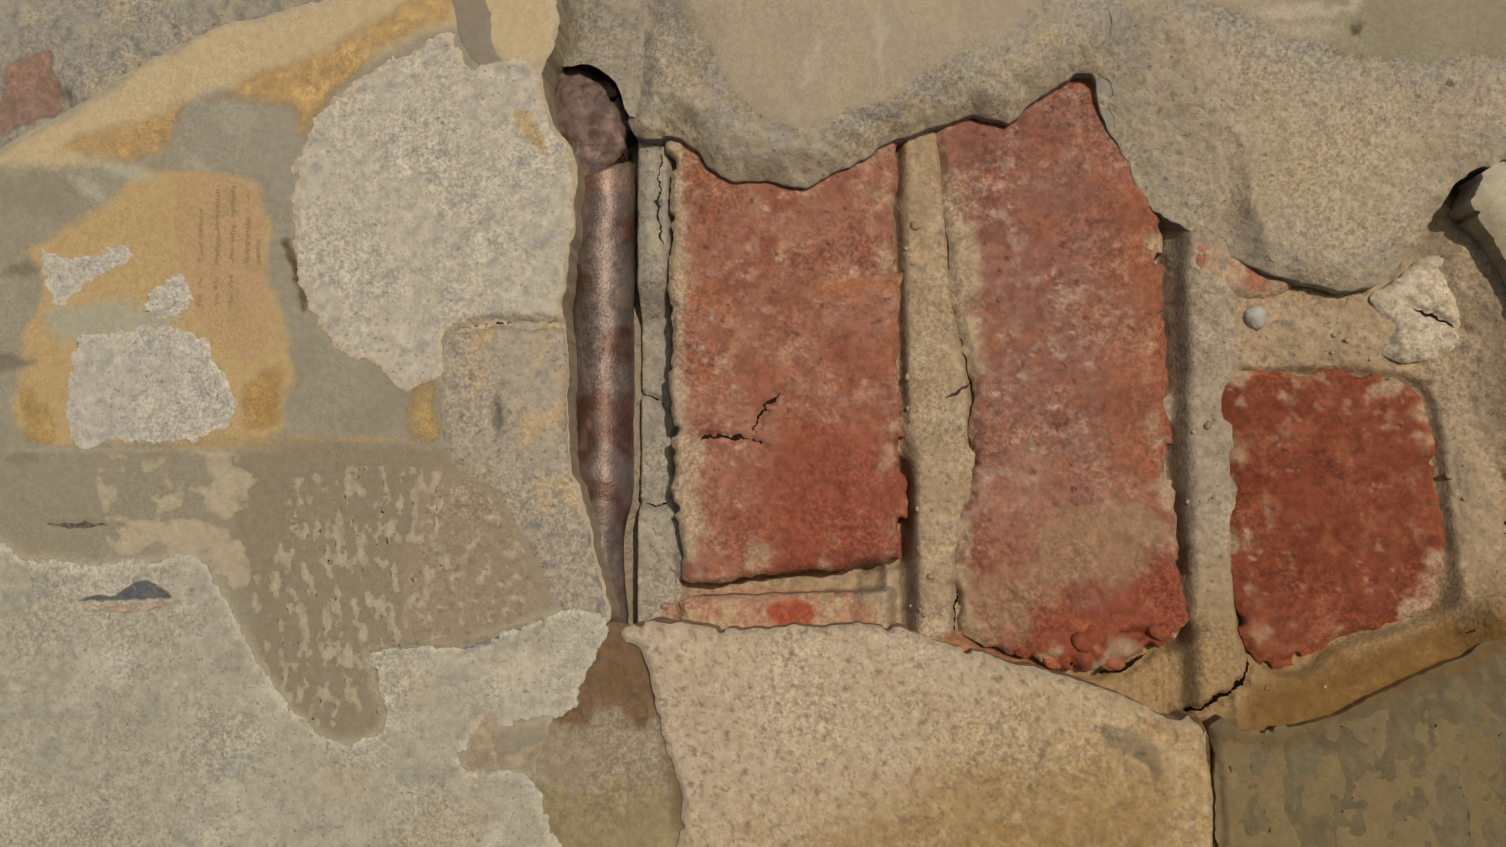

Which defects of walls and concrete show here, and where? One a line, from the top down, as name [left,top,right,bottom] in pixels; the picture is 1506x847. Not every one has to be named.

peeling [290,0,575,393]
spalling [561,0,1506,290]
peeling [65,274,454,729]
spalling [463,498,684,847]
crack [701,393,780,444]
spalling [1071,624,1126,671]